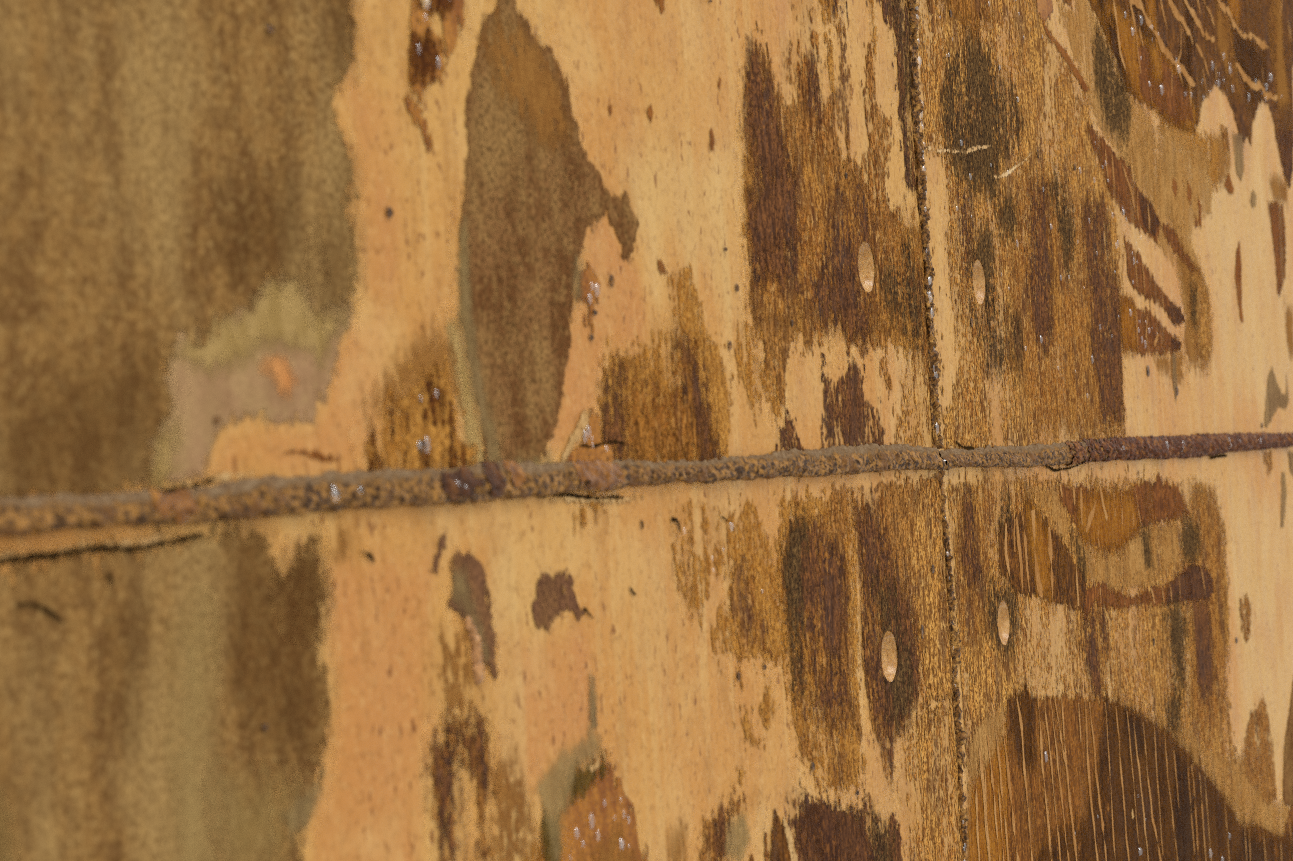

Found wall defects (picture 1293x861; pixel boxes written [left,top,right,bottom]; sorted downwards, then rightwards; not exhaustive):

leakage [0,0,360,499]
rust [363,327,527,500]
leakage [447,0,639,465]
rust [568,0,1293,861]
leakage [0,520,331,861]